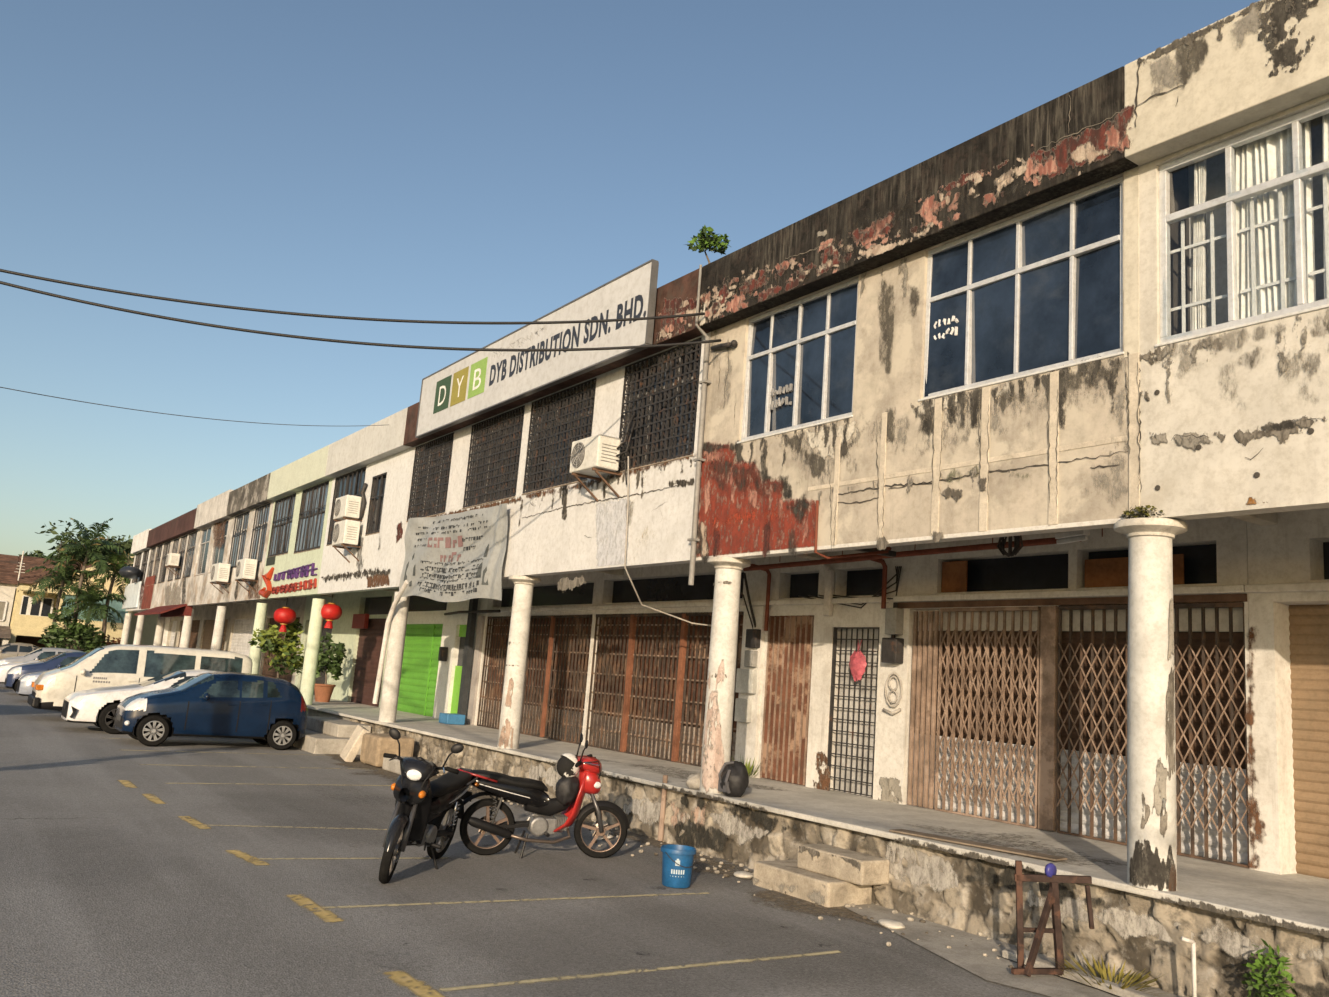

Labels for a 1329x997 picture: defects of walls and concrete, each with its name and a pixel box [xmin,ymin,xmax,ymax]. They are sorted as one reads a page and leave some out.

peeling [1258,0,1319,78]
peeling [656,105,1135,342]
peeling [696,442,816,563]
damp [735,418,860,505]
damp [860,258,919,373]
damp [874,356,1128,499]
damp [1153,309,1329,403]
peeling [623,659,769,846]
peeling [1152,598,1175,816]
corrosion [1245,627,1265,868]
damp [895,792,1329,938]
damp [1283,977,1329,997]